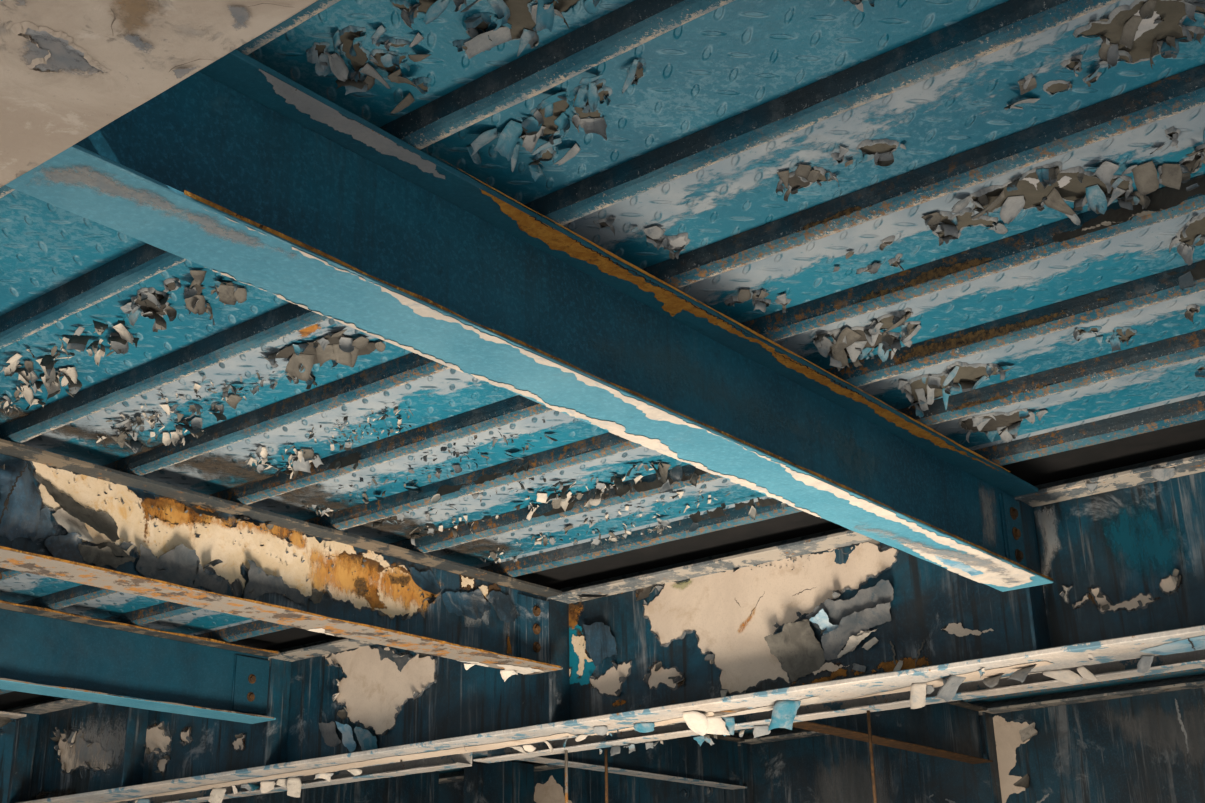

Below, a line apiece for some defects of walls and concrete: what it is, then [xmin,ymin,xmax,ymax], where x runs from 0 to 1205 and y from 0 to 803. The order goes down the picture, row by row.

peeling [306,0,602,114]
peeling [1004,0,1205,110]
peeling [259,69,445,179]
peeling [467,58,647,182]
peeling [921,126,1205,246]
peeling [833,236,904,274]
peeling [1184,304,1200,324]
rust [184,169,1067,581]
rust [0,491,561,668]
peeling [0,247,1099,803]
peeling [1059,569,1181,614]
peeling [1127,464,1181,481]